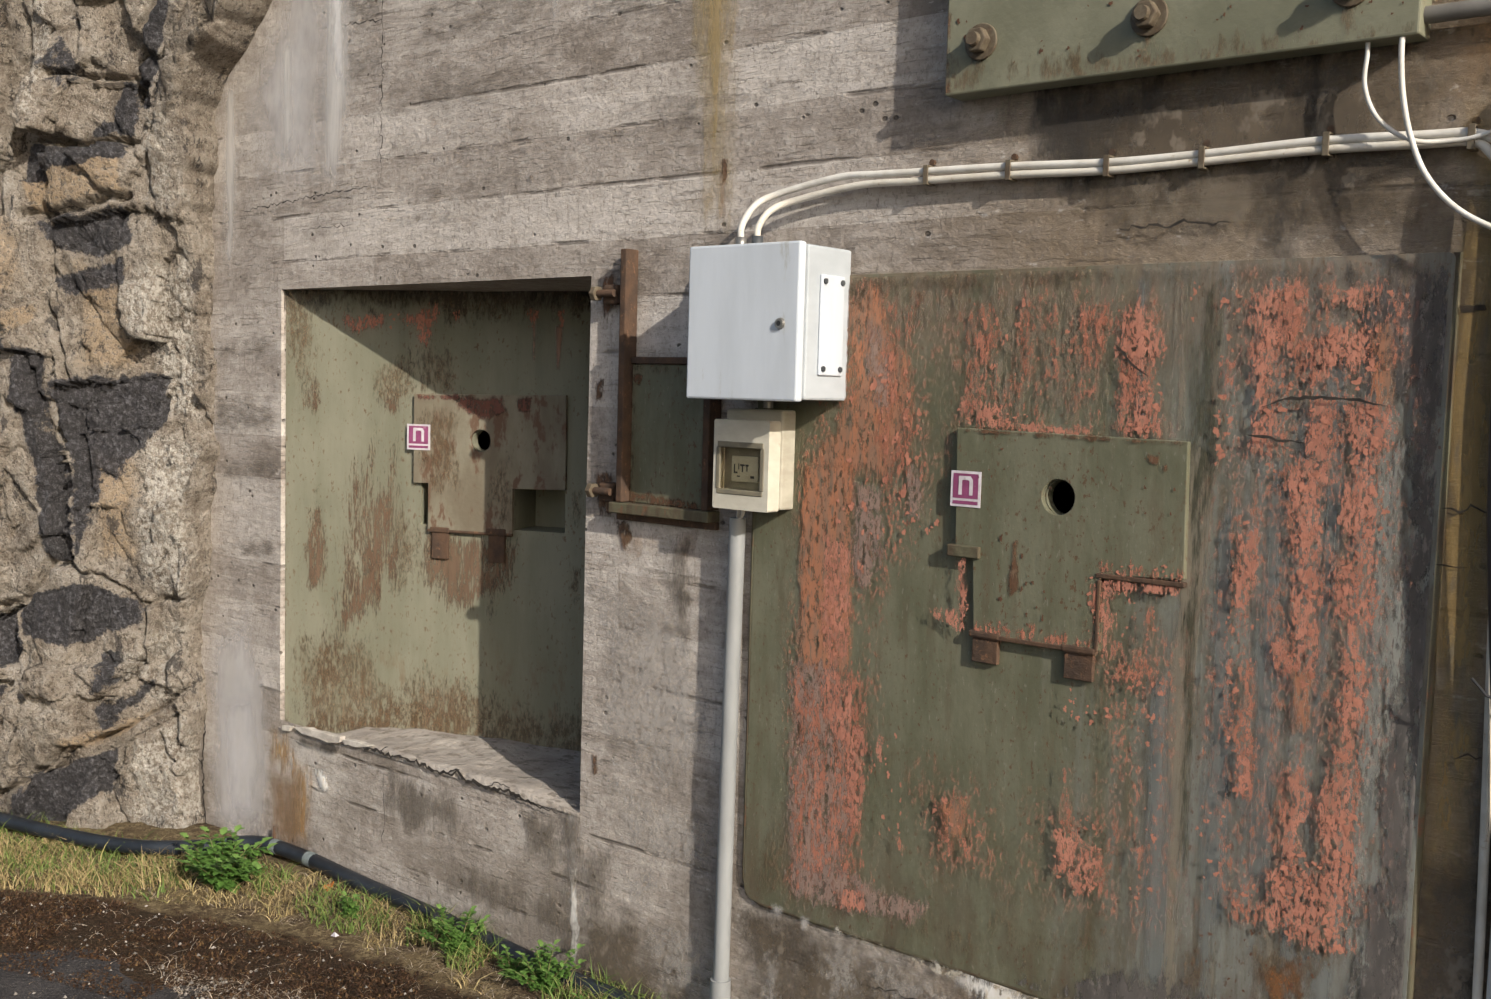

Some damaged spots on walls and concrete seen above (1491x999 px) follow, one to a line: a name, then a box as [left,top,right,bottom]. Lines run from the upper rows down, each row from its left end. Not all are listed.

crack [339,742,557,838]
corrosion [284,274,614,363]
corrosion [301,445,597,775]
leakage [748,916,943,999]
peeling [782,280,1183,938]
leakage [960,975,1038,999]
leakage [1248,478,1283,879]
peeling [1195,267,1415,973]
leakage [1281,931,1332,999]
leakage [1318,359,1345,678]
leakage [1416,806,1491,999]
leakage [1438,256,1490,693]